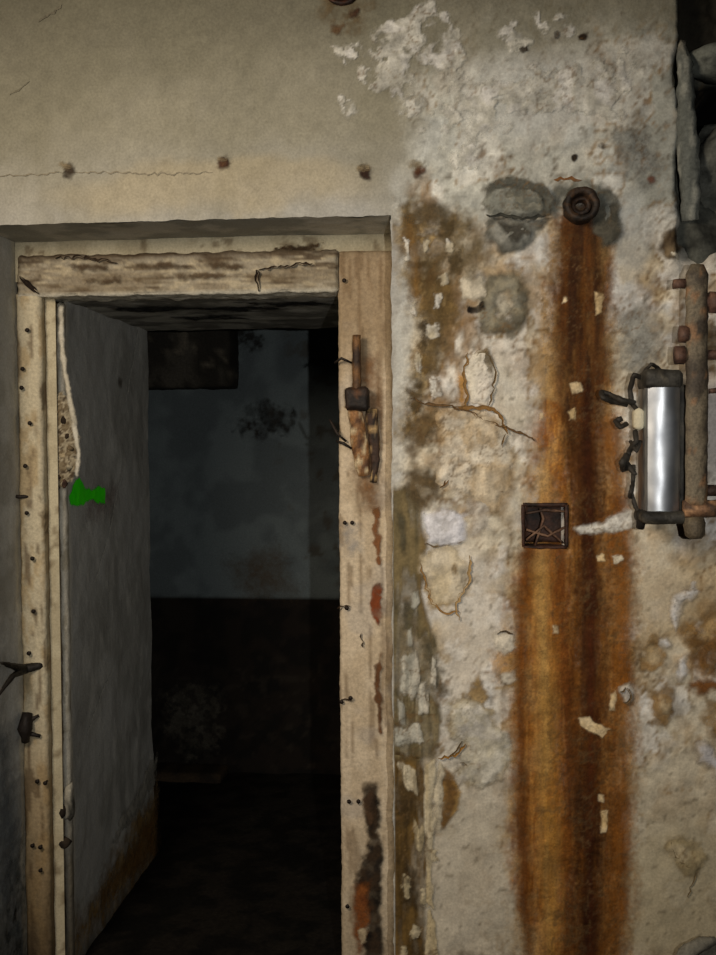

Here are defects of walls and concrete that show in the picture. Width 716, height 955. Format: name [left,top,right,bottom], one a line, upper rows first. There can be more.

peeling [331,0,634,169]
crack [0,170,212,178]
spalling [274,243,319,251]
spalling [659,228,681,259]
spalling [74,264,120,284]
spalling [141,262,242,279]
rust [510,203,634,955]
peeling [370,487,511,955]
rust [353,884,370,953]